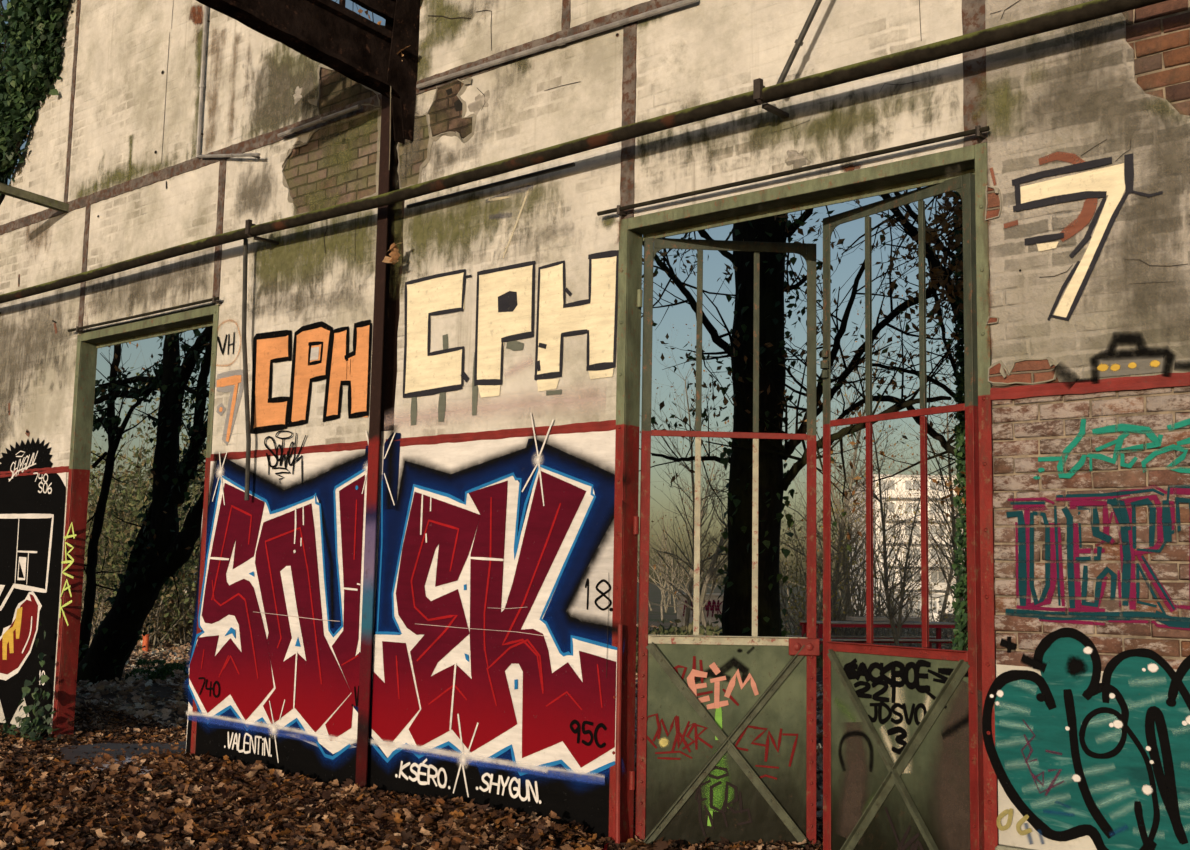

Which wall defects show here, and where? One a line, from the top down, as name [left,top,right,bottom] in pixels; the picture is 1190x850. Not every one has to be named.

water stain [238,165,271,212]
water stain [253,59,315,126]
spalling [282,64,382,216]
spalling [396,77,477,189]
water stain [254,281,360,313]
peeling [985,0,1190,671]